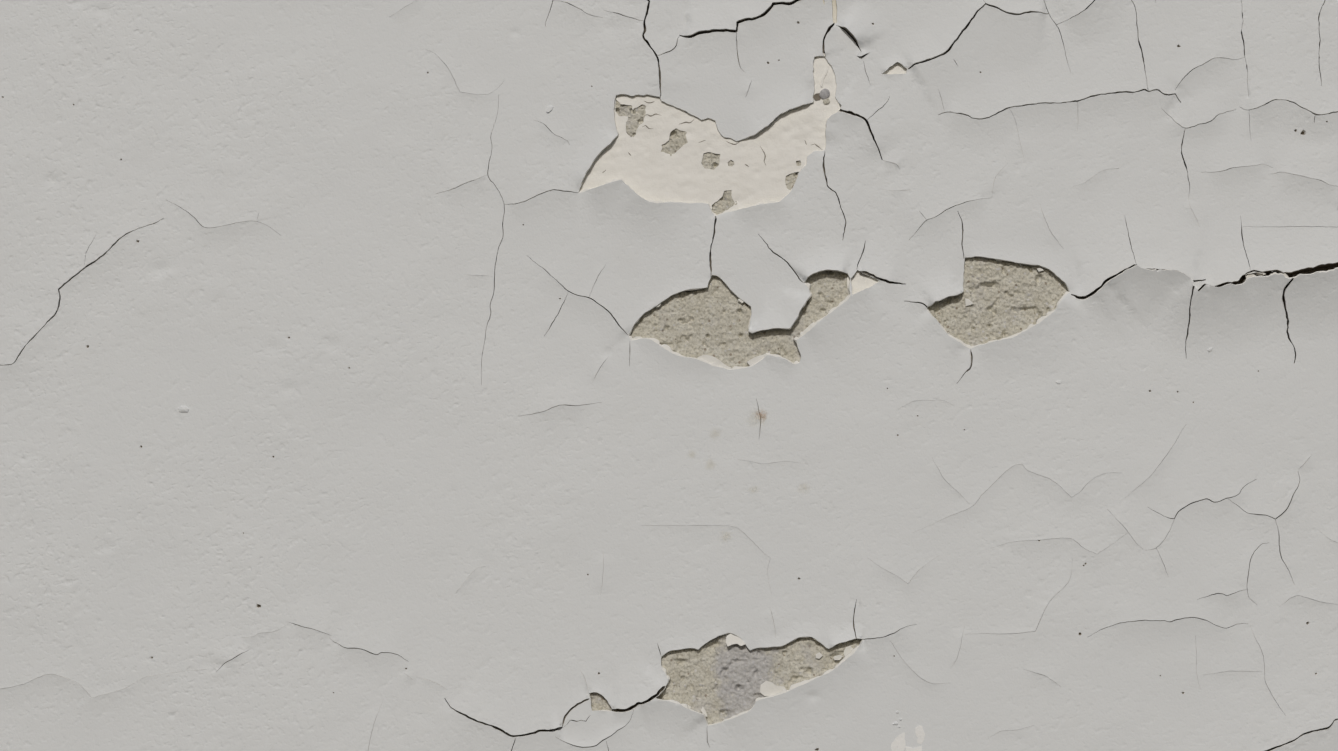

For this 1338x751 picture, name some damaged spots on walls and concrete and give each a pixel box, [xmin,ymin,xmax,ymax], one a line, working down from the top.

peeling [578,53,843,218]
crack [545,0,1338,257]
crack [6,200,280,365]
crack [428,50,630,416]
crack [709,218,717,272]
peeling [628,269,880,370]
crack [822,153,927,307]
peeling [927,256,1070,349]
crack [1071,215,1338,363]
crack [853,425,1338,751]
peeling [589,692,616,711]
peeling [651,633,863,726]